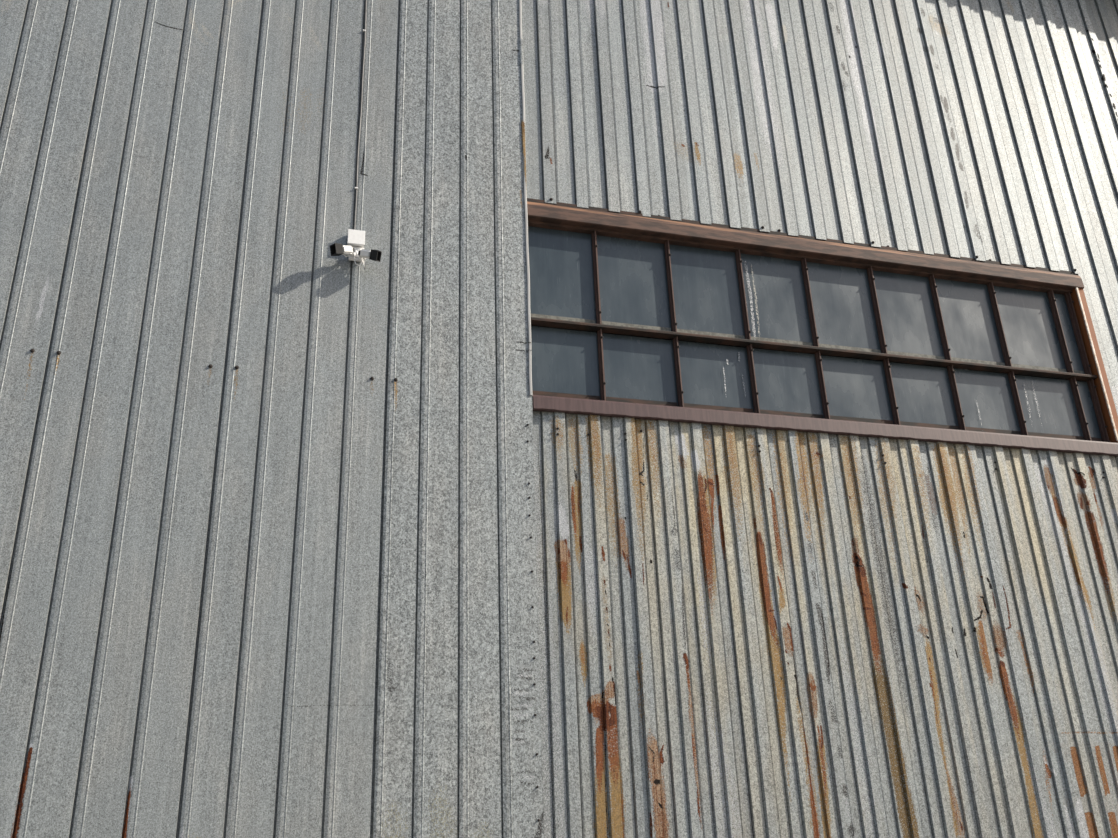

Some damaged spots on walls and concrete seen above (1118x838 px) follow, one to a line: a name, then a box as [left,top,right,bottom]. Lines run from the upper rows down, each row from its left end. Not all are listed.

corrosion [11,743,33,838]
corrosion [550,415,662,838]
corrosion [675,426,832,838]
corrosion [838,435,920,838]
corrosion [909,443,983,581]
corrosion [974,466,1118,838]